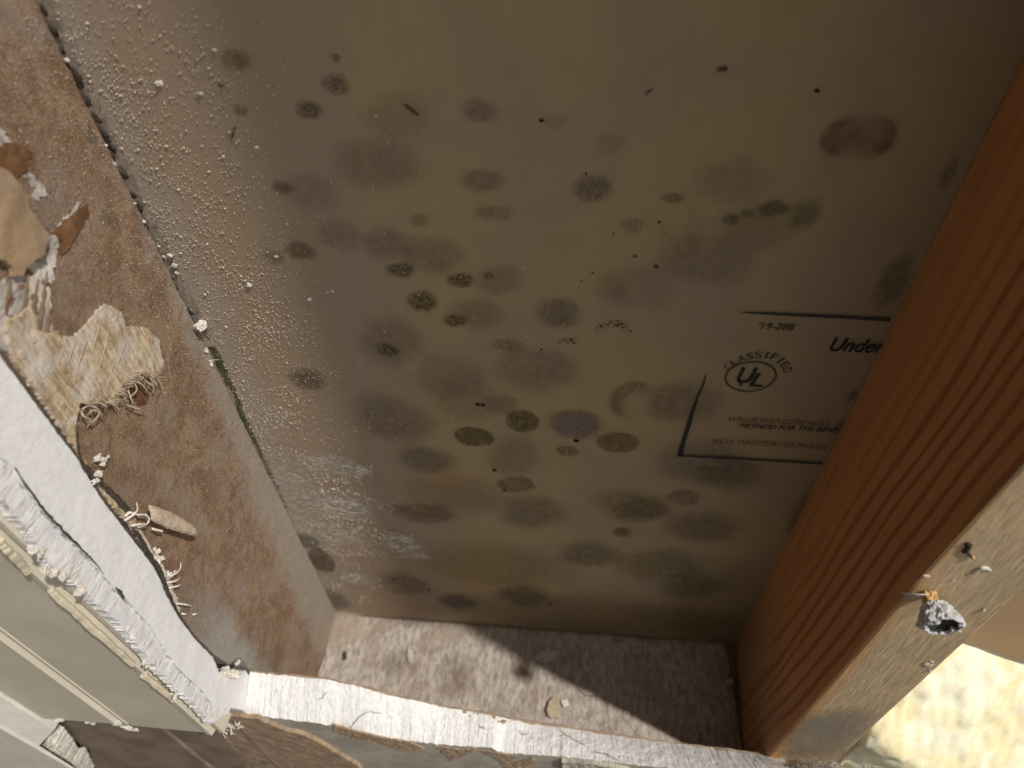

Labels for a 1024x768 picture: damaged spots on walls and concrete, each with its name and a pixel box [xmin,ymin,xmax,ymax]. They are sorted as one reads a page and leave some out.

peeling [0,142,89,276]
water stain [208,347,287,507]
water stain [455,428,494,446]